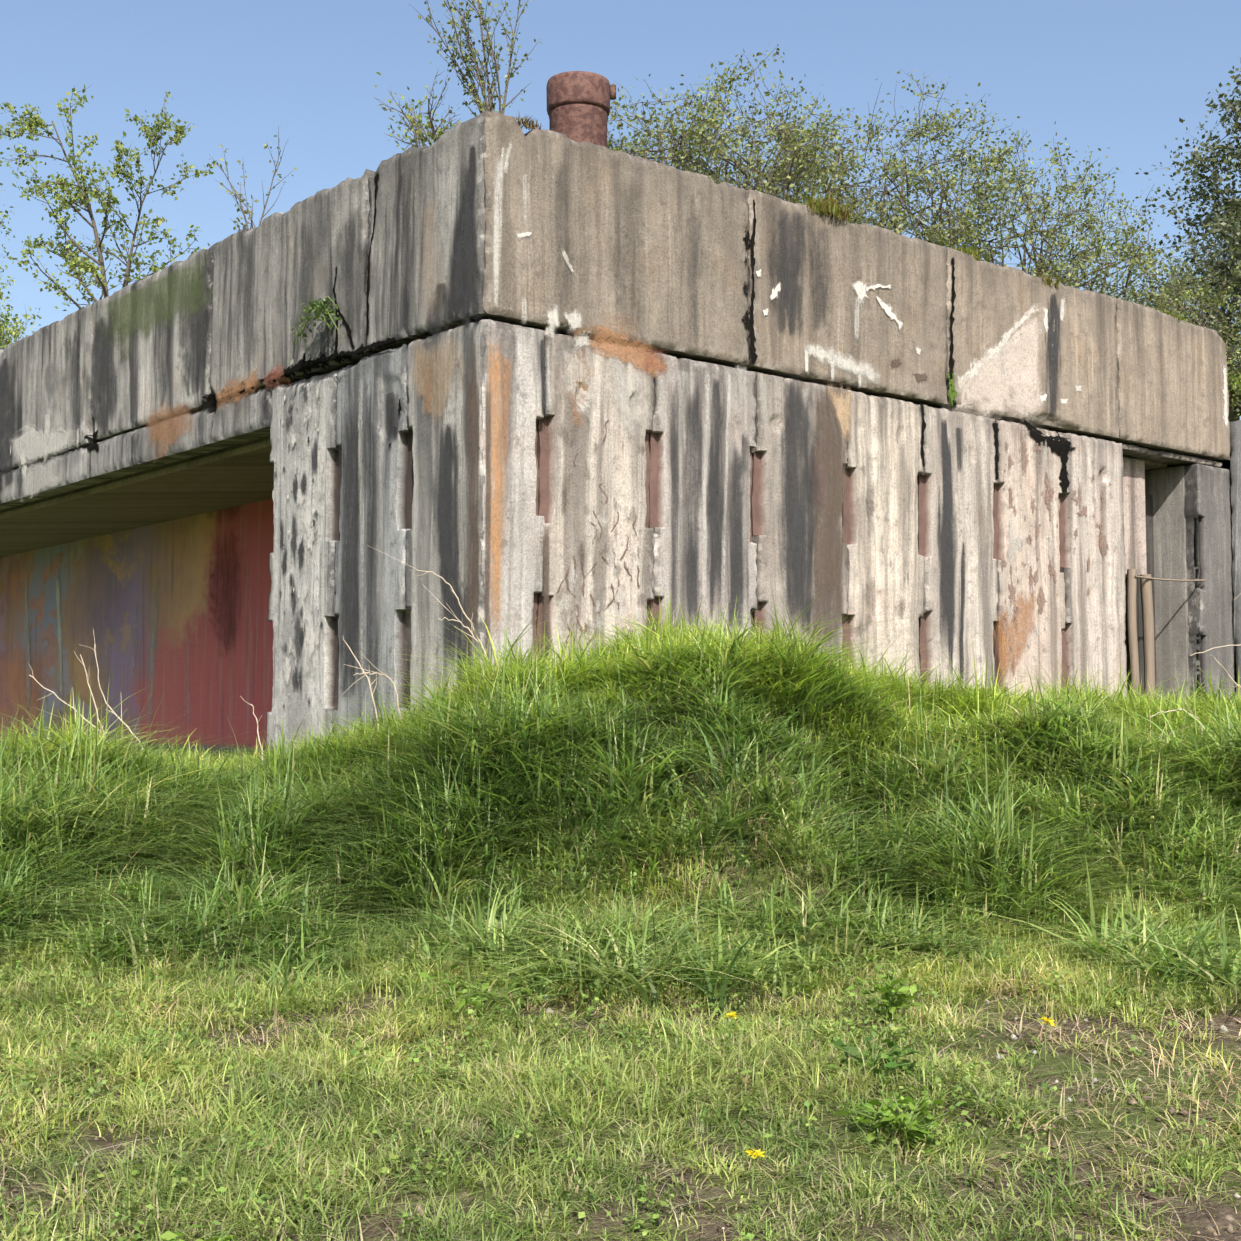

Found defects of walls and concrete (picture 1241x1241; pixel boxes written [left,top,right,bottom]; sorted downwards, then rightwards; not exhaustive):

water stain [0,314,117,494]
water stain [180,275,207,393]
rust [217,367,289,403]
crack [221,172,397,399]
water stain [345,223,355,325]
rust [485,353,508,667]
rust [592,326,666,375]
crack [742,200,758,365]
water stain [770,213,805,333]
crack [920,257,957,466]
crack [992,423,1000,479]
rust [999,596,1034,676]